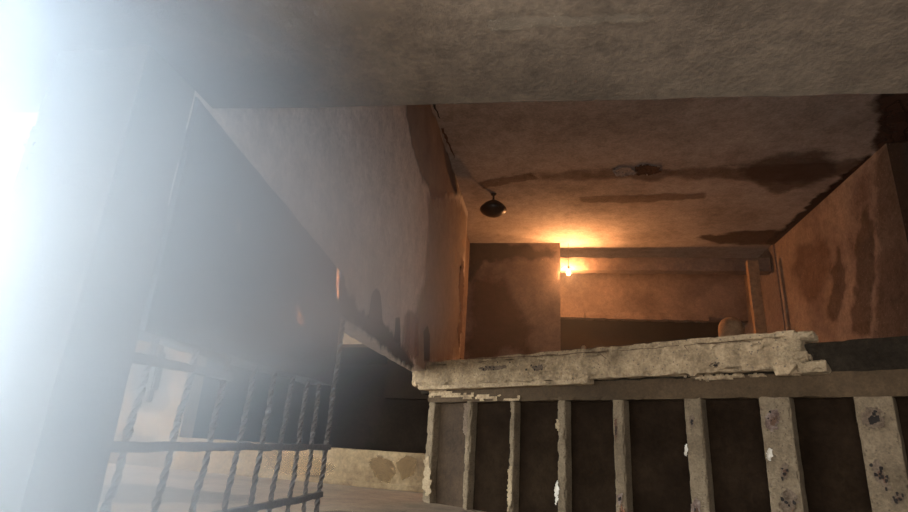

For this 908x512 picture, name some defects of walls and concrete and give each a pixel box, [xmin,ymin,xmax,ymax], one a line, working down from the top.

crack [432,104,455,157]
flaking render [635,164,662,176]
damp [700,93,908,245]
flaking render [678,362,767,382]
flaking render [775,331,831,376]